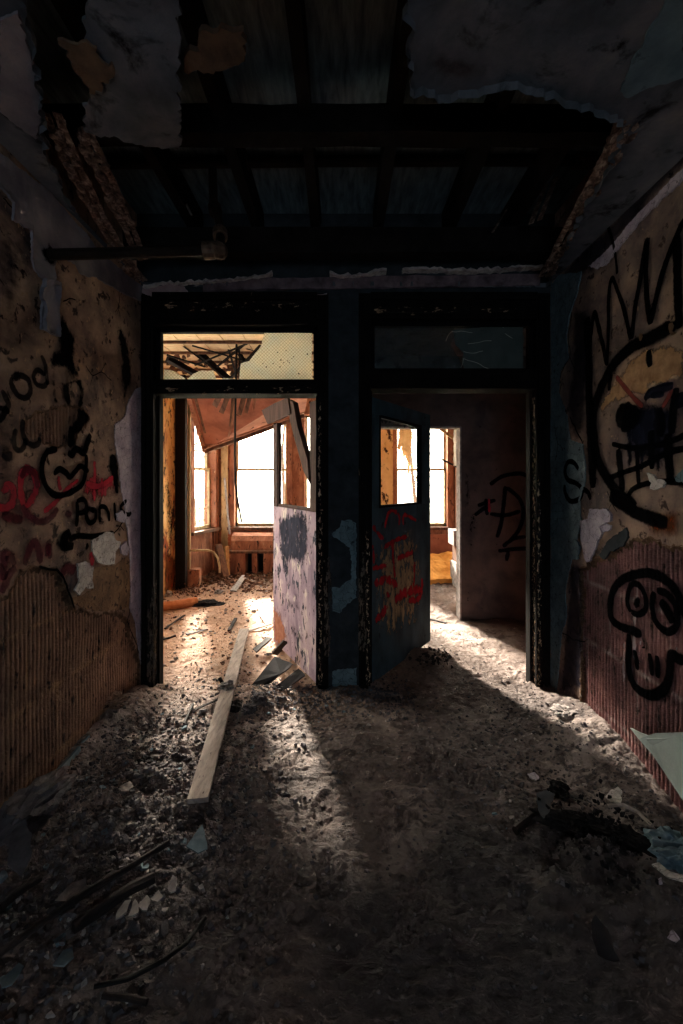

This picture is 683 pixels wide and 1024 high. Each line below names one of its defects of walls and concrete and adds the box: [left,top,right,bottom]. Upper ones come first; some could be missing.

peeling [0,10,42,139]
peeling [58,37,115,95]
peeling [184,22,247,75]
spalling [532,168,683,813]
spalling [0,387,158,808]